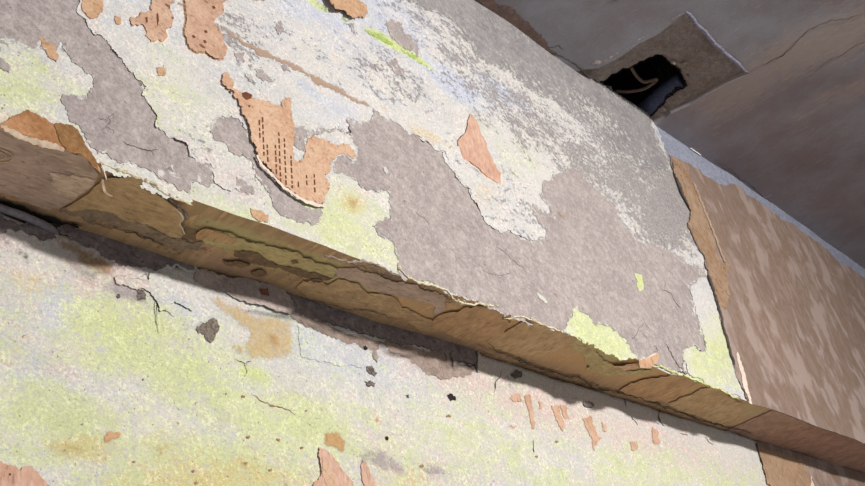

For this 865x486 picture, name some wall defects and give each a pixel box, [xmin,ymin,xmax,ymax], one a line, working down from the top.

flaking render [0,0,749,398]
crack [90,224,165,279]
crack [350,263,399,280]
leakage [217,300,292,357]
peeling [510,393,570,431]
peeling [583,400,607,450]
peeling [0,461,49,486]
peeling [313,447,376,486]